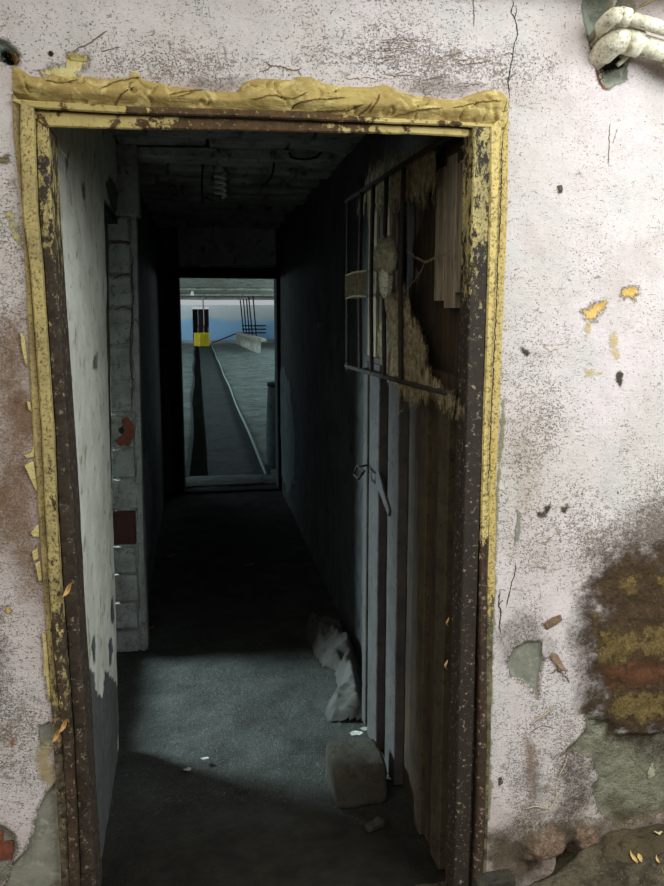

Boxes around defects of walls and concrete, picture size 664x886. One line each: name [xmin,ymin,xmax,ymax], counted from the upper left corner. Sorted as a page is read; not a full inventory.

spalling [0,39,22,67]
crack [347,37,489,88]
crack [487,0,518,510]
peeling [20,332,28,367]
spalling [116,417,134,446]
peeling [24,445,38,492]
peeling [32,548,42,582]
water stain [574,515,664,744]
peeling [42,632,51,702]
spalling [555,714,664,834]
spalling [0,721,61,886]